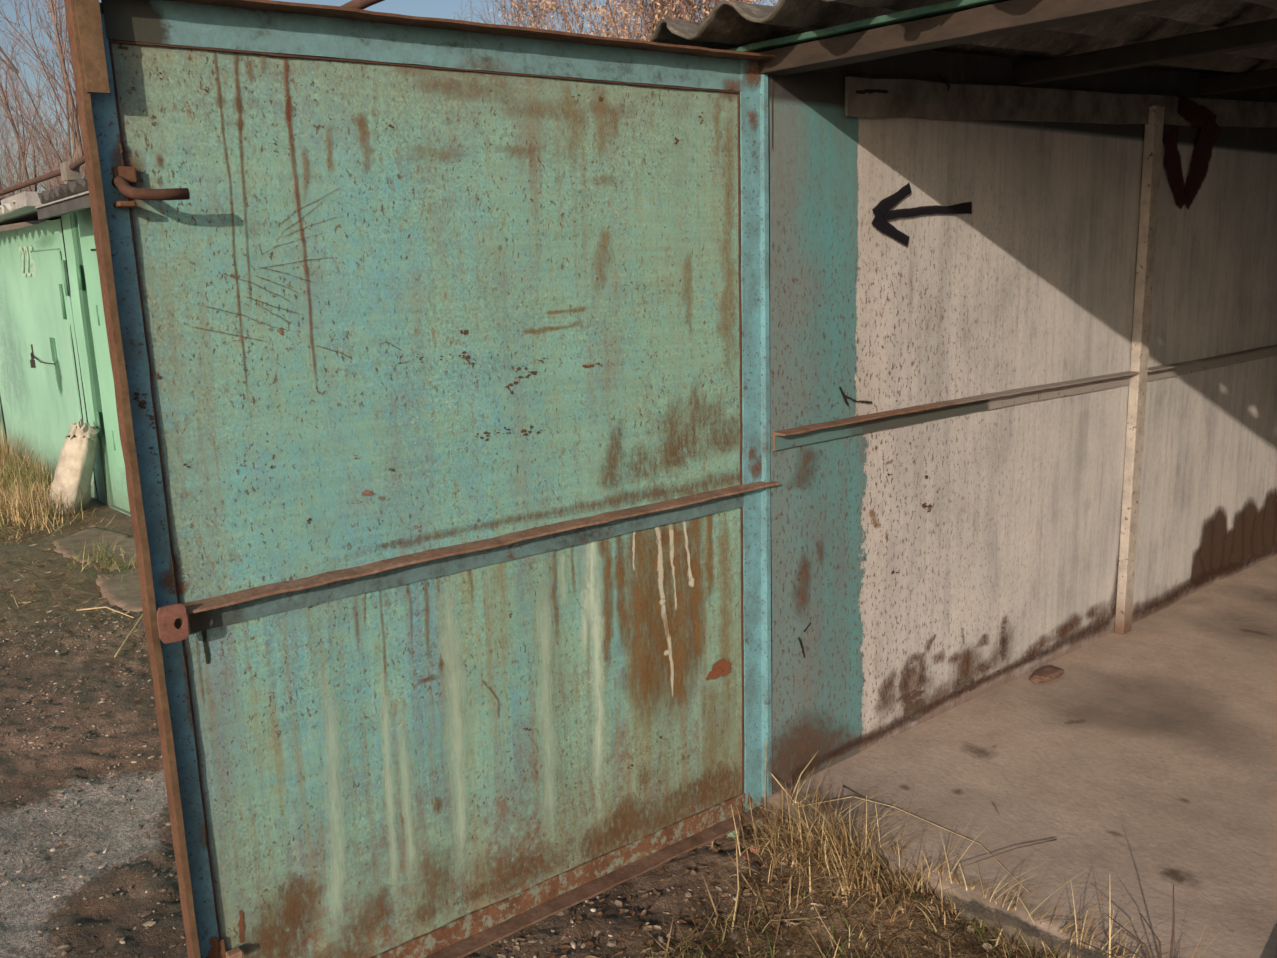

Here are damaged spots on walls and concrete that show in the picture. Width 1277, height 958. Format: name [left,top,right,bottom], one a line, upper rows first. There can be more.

rust [215,48,263,376]
rust [284,57,315,370]
rust [525,308,584,333]
rust [664,394,739,465]
rust [580,438,762,508]
rust [599,514,727,701]
rust [1134,547,1277,617]
rust [706,649,731,680]
rust [797,547,1120,775]
rust [237,887,311,958]